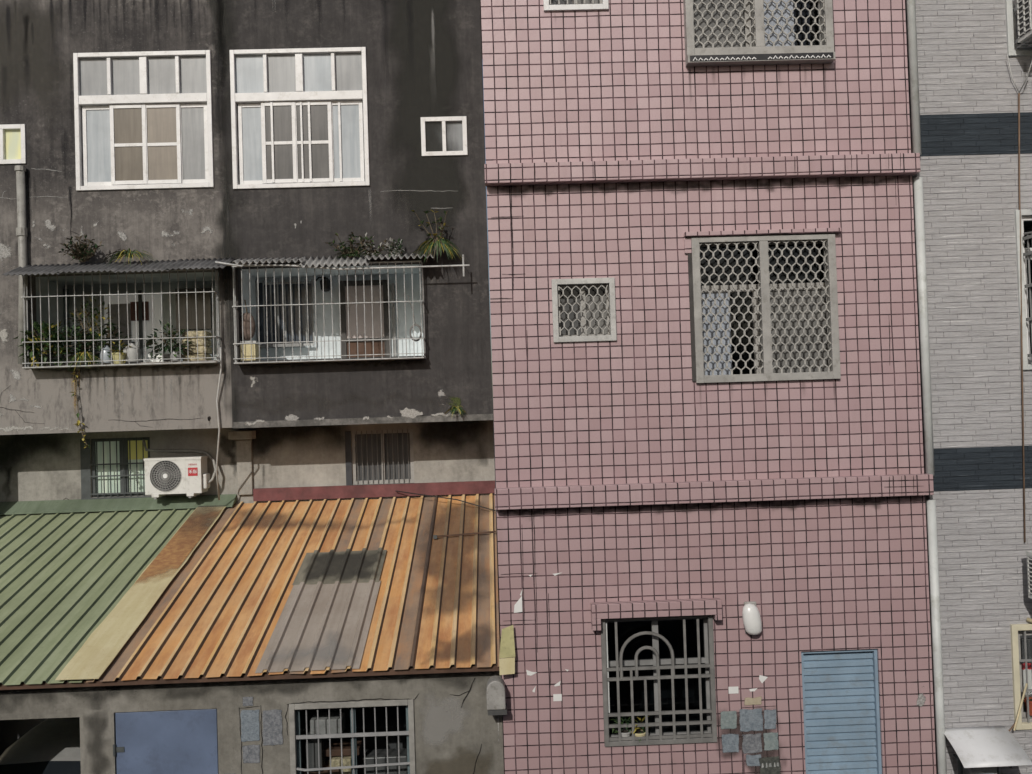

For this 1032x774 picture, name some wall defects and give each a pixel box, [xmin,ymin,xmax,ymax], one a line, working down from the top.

spalling [387,408,460,419]